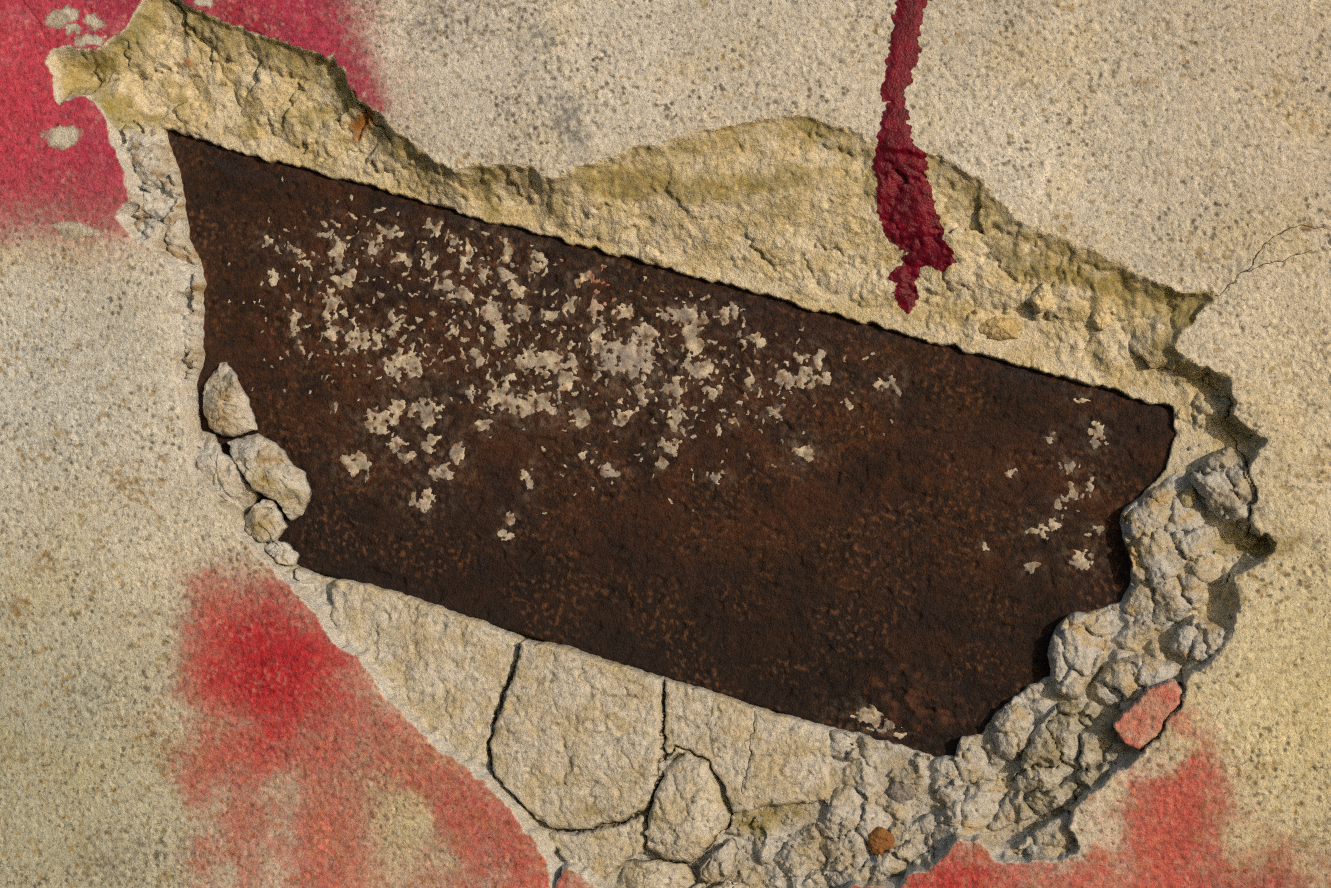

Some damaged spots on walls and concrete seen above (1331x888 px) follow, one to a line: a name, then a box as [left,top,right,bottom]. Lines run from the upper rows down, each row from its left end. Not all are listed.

peeling [41,125,81,149]
peeling [260,207,832,478]
peeling [1088,421,1109,449]
peeling [339,450,372,483]
peeling [408,441,465,513]
peeling [560,443,621,491]
peeling [1024,461,1094,539]
peeling [497,511,515,541]
peeling [1069,525,1104,570]
crack [487,637,755,853]
peeling [850,704,907,739]
rust [862,663,969,735]